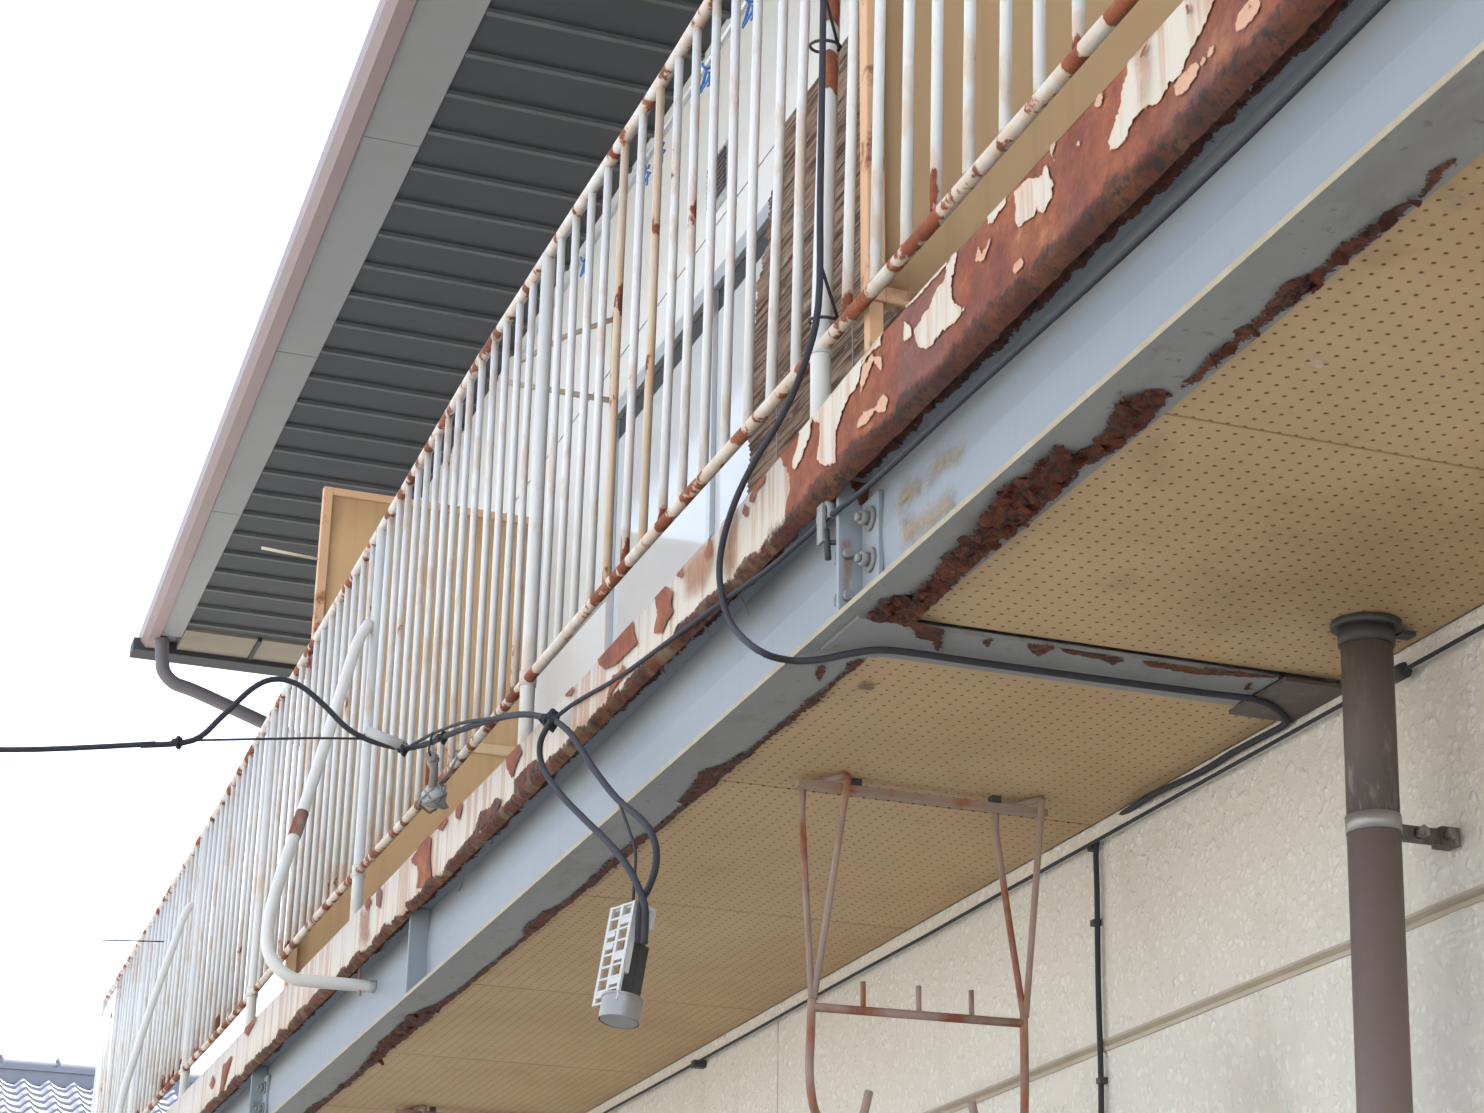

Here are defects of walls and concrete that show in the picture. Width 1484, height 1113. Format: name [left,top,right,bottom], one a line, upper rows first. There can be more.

peeling [780,0,1284,526]
rust [1294,251,1349,304]
rust [1358,198,1422,241]
rust [200,0,1335,1113]